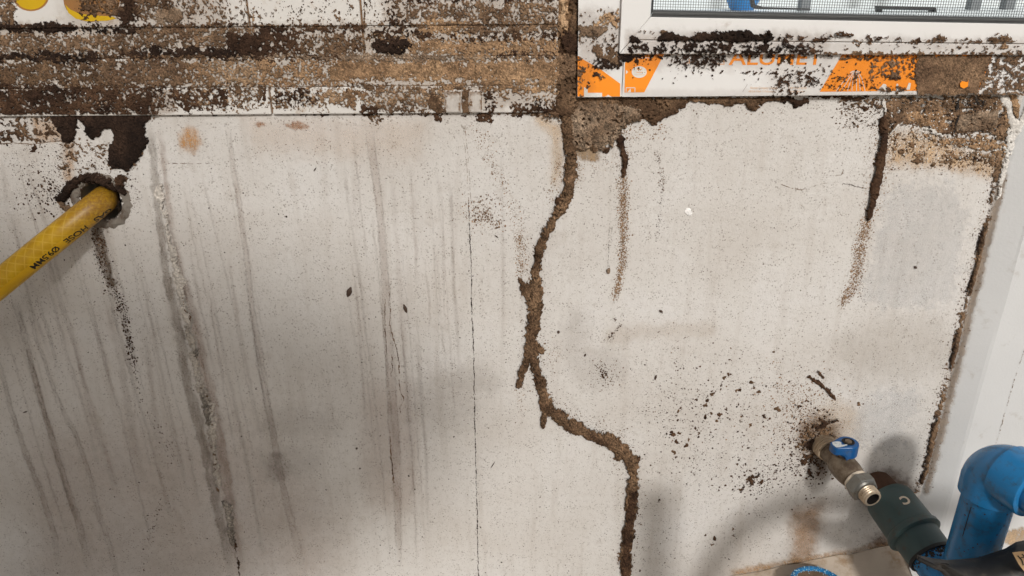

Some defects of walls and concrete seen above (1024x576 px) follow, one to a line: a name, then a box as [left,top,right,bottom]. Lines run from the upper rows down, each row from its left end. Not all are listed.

crack [463,128,479,576]